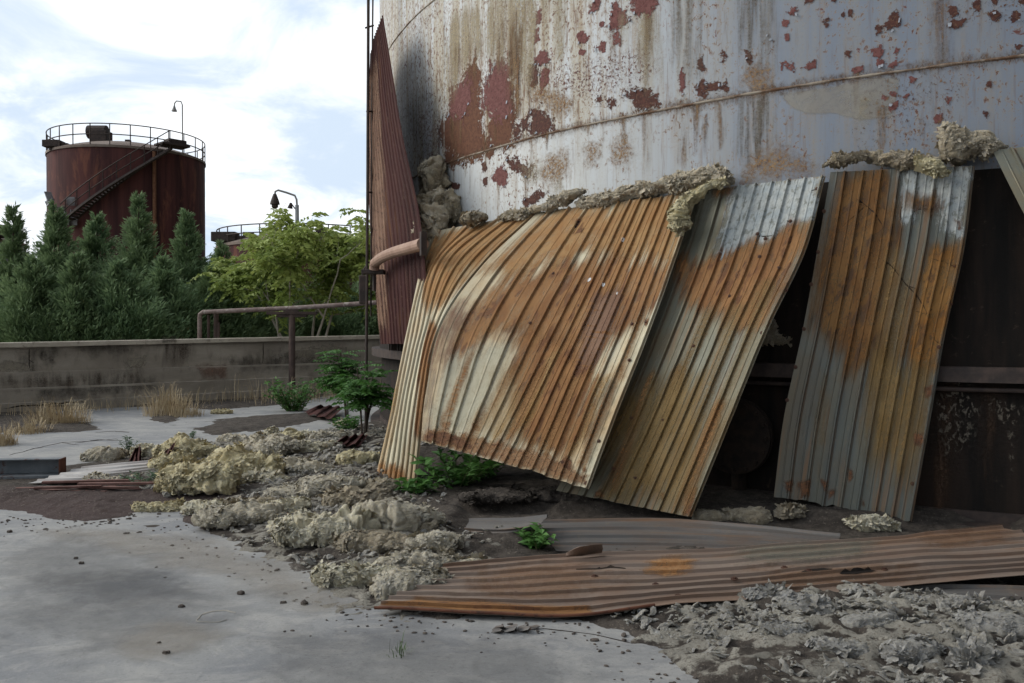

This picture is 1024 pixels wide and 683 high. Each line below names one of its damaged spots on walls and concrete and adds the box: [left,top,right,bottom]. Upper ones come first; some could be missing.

peeling [437,0,662,208]
peeling [678,55,729,99]
peeling [744,0,814,66]
peeling [780,59,816,73]
peeling [844,8,961,130]
peeling [939,0,1024,29]
rust [369,60,388,333]
rust [414,194,809,516]
rust [808,169,961,474]
rust [383,598,592,614]